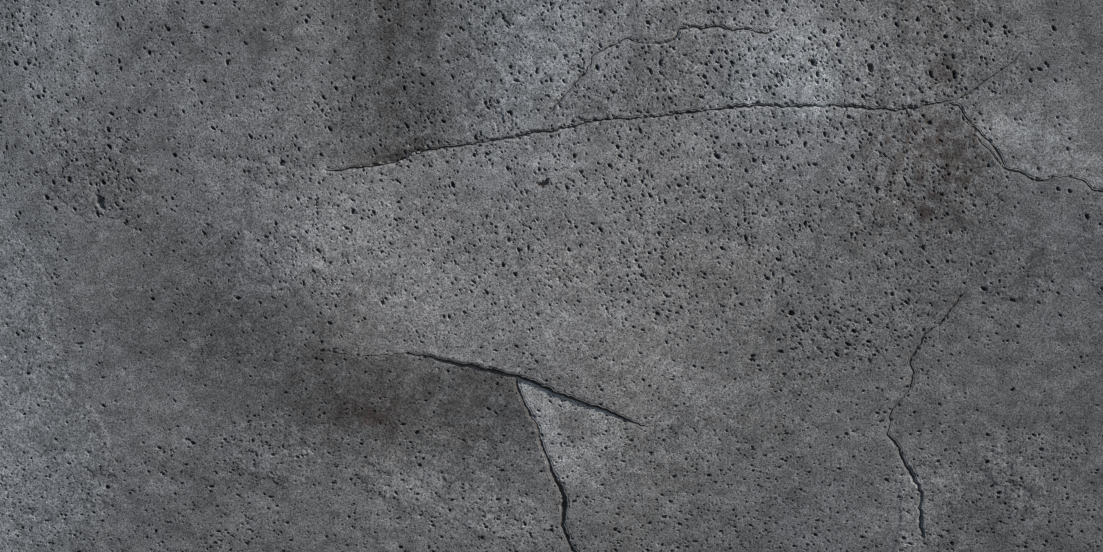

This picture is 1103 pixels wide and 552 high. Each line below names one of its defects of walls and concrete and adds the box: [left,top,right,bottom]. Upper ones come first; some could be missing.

crack [325,24,1103,194]
crack [321,349,649,552]
crack [885,292,966,537]